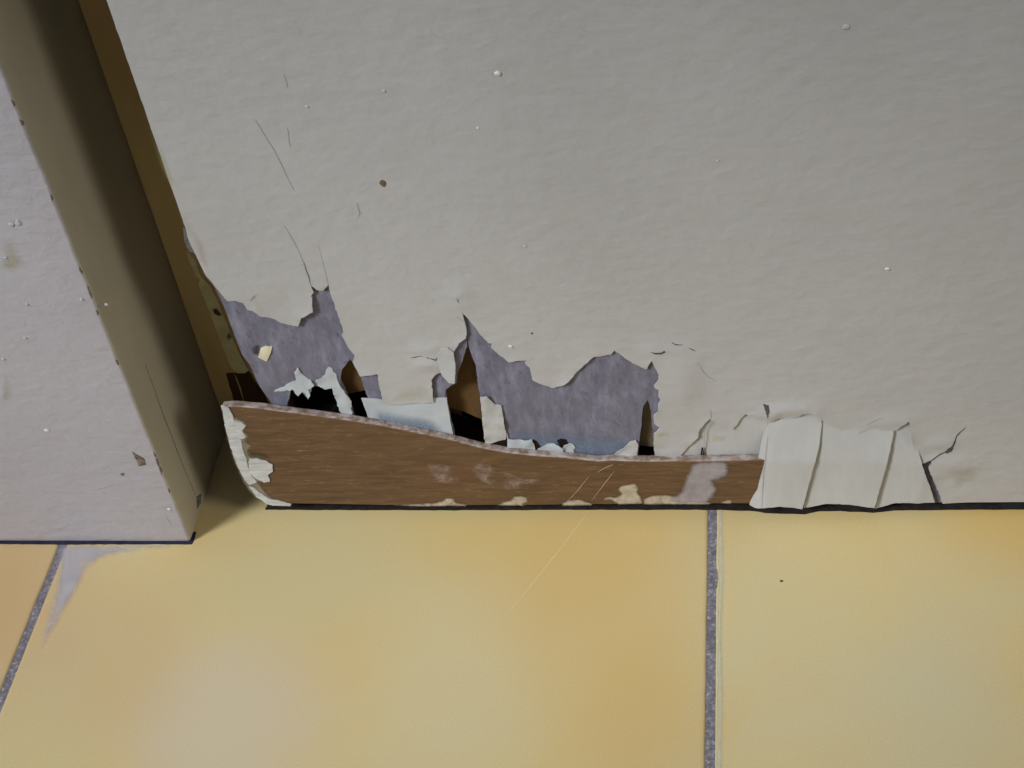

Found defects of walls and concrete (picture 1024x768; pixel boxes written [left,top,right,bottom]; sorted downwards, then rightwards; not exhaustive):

peeling [214,286,660,456]
peeling [221,405,291,506]
crack [924,427,966,464]